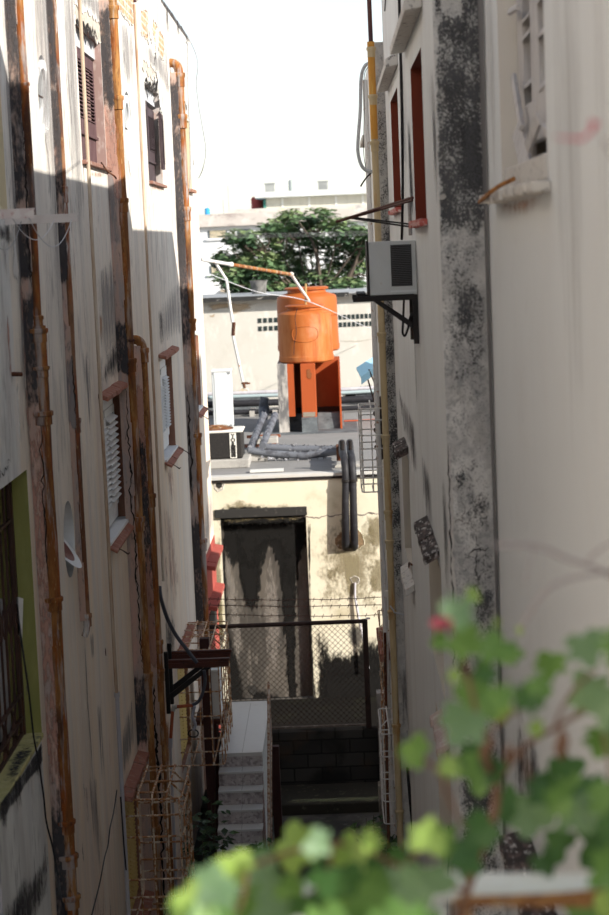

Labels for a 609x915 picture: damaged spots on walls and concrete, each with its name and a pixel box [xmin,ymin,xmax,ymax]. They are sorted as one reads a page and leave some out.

damp [4,0,26,209]
damp [0,224,39,436]
damp [58,222,69,284]
damp [60,358,76,429]
damp [36,0,120,227]
damp [101,265,129,378]
spalling [117,0,165,81]
damp [150,51,191,346]
damp [185,388,197,491]
damp [0,429,68,915]
damp [122,677,147,767]
damp [191,500,384,700]